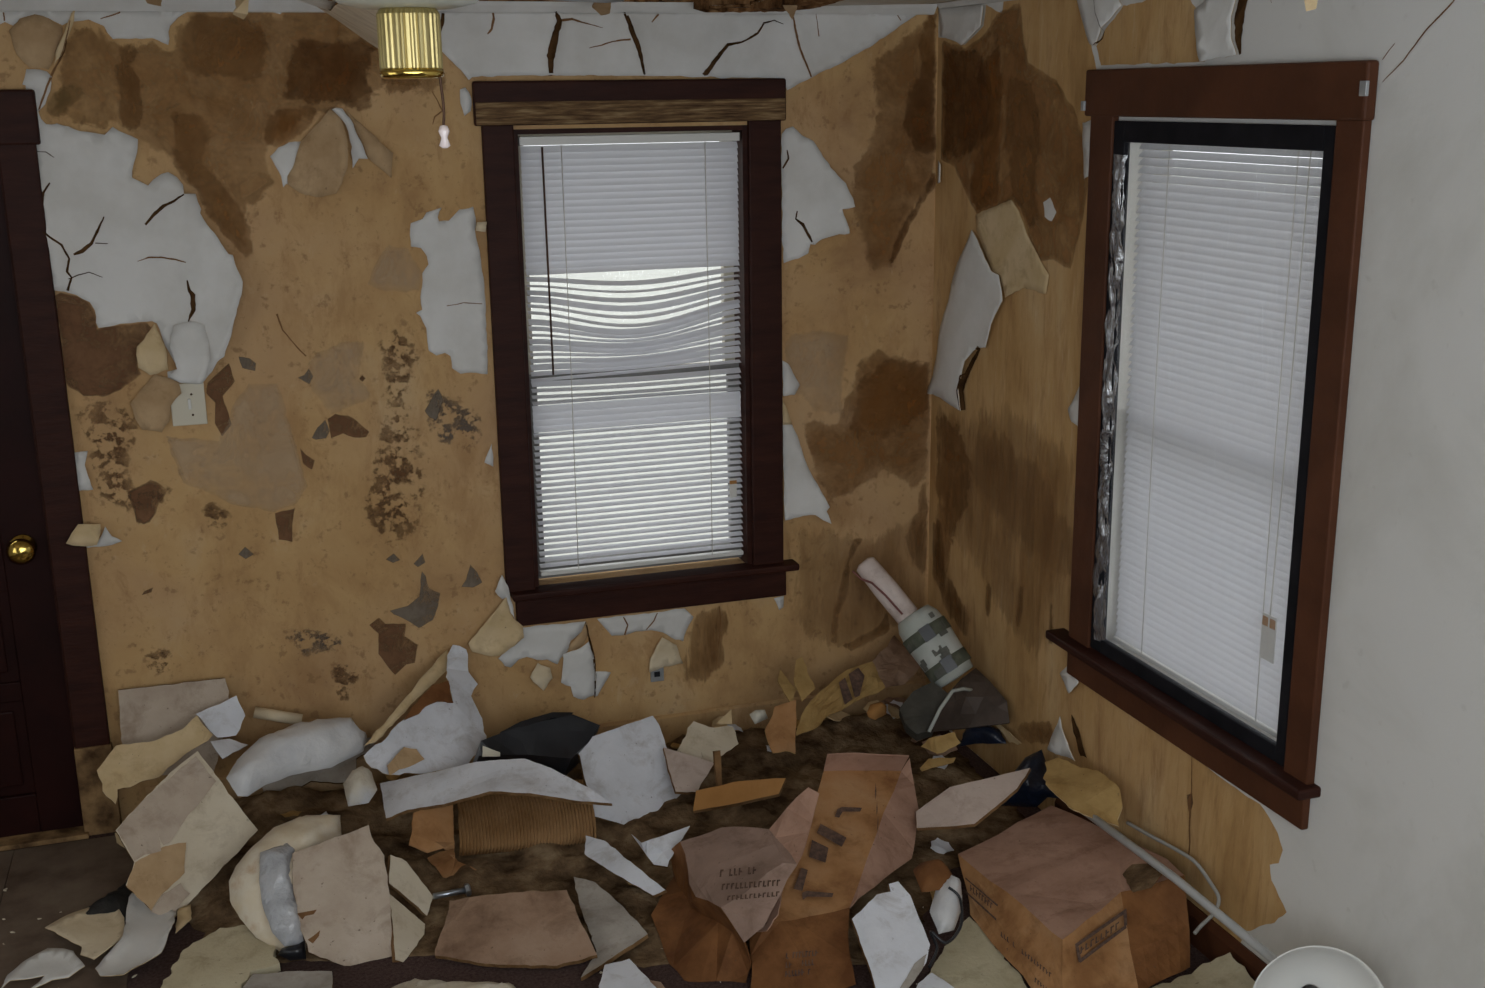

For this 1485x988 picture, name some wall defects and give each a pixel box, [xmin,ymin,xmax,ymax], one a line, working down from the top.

crack [37,151,108,291]
peeling [0,11,256,436]
crack [139,194,196,322]
leakage [61,12,432,246]
crack [547,11,659,76]
peeling [439,12,919,116]
crack [702,16,819,77]
peeling [781,126,855,263]
leakage [857,7,1086,265]
mould [88,407,164,524]
mould [368,333,421,534]
peeling [926,0,1286,942]